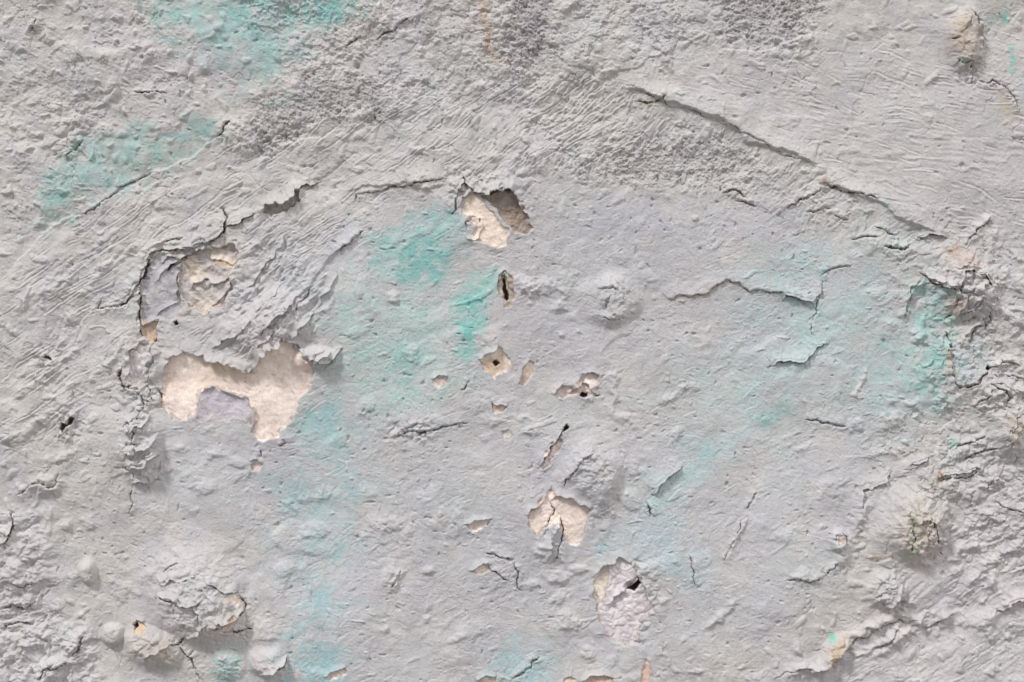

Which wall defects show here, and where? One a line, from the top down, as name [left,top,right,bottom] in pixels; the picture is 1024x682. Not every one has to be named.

crack [638,93,792,157]
crack [85,174,150,214]
crack [301,178,316,186]
crack [355,176,511,225]
spalling [455,176,536,248]
crack [259,290,309,334]
crack [677,266,845,367]
spalling [121,227,314,471]
spalling [477,344,534,386]
spalling [550,366,601,399]
spalling [525,487,592,563]
spalling [590,548,658,646]